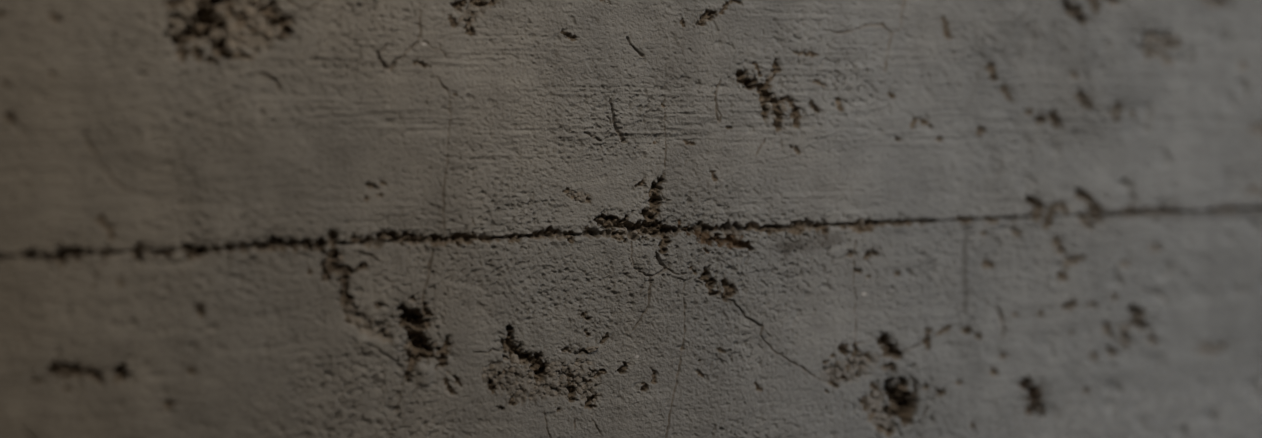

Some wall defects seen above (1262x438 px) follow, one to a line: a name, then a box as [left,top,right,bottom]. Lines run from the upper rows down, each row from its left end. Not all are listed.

spalling [152,0,301,70]
spalling [446,0,498,37]
spalling [726,57,846,156]
crack [630,239,688,438]
crack [726,298,824,383]
crack [844,238,902,343]
spalling [821,323,984,437]
crack [990,303,1020,377]